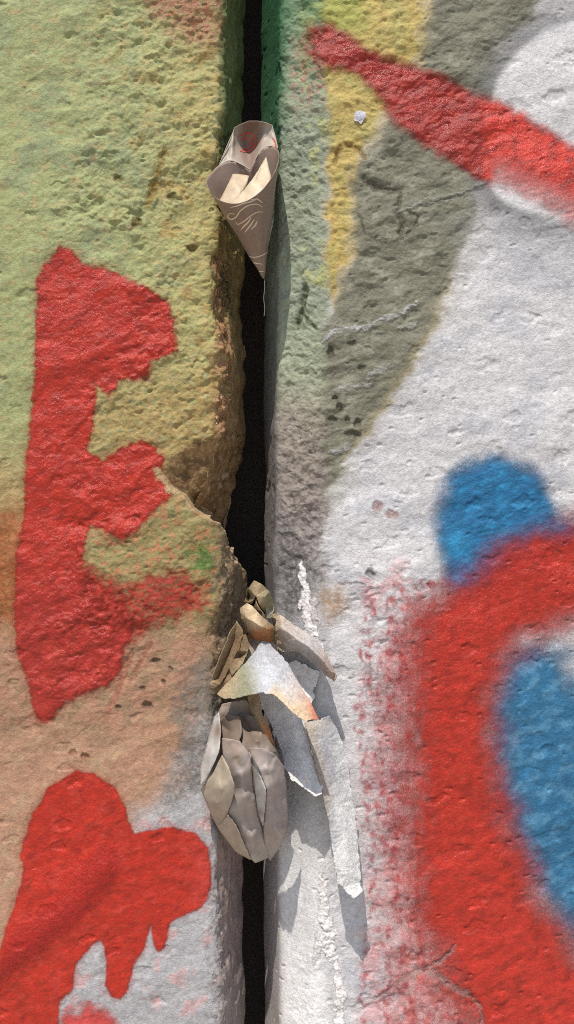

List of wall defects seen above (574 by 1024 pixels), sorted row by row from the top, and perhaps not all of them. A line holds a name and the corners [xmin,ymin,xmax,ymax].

peeling [153,253,404,1024]